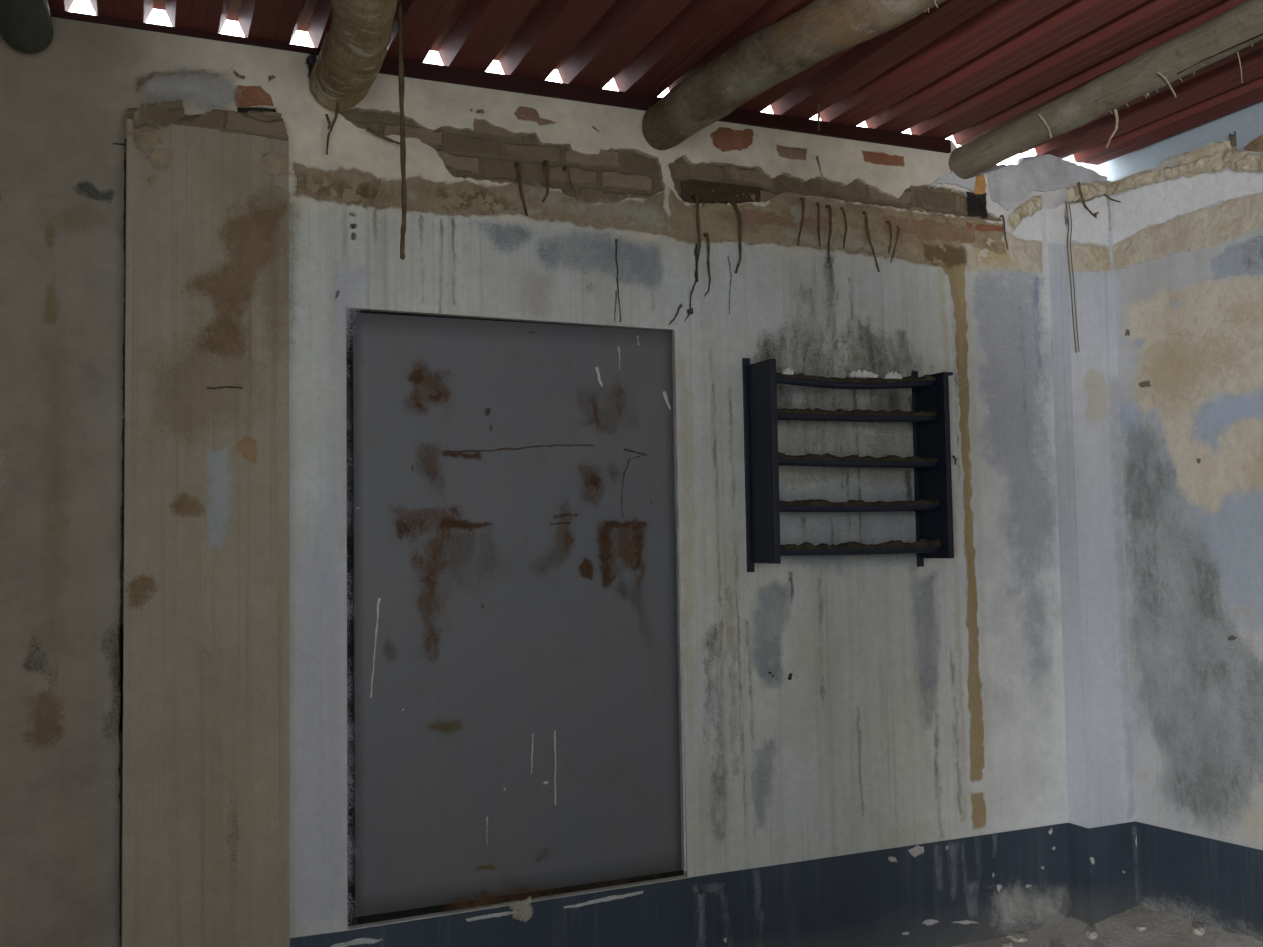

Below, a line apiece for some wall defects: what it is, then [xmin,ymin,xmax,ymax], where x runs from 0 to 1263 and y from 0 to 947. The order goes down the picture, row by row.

flaking render [133,68,289,141]
flaking render [291,106,1043,273]
flaking render [1067,135,1263,203]
flaking render [1067,191,1263,273]
rust [526,458,656,650]
leakage [673,246,996,840]
leakage [1105,374,1263,843]